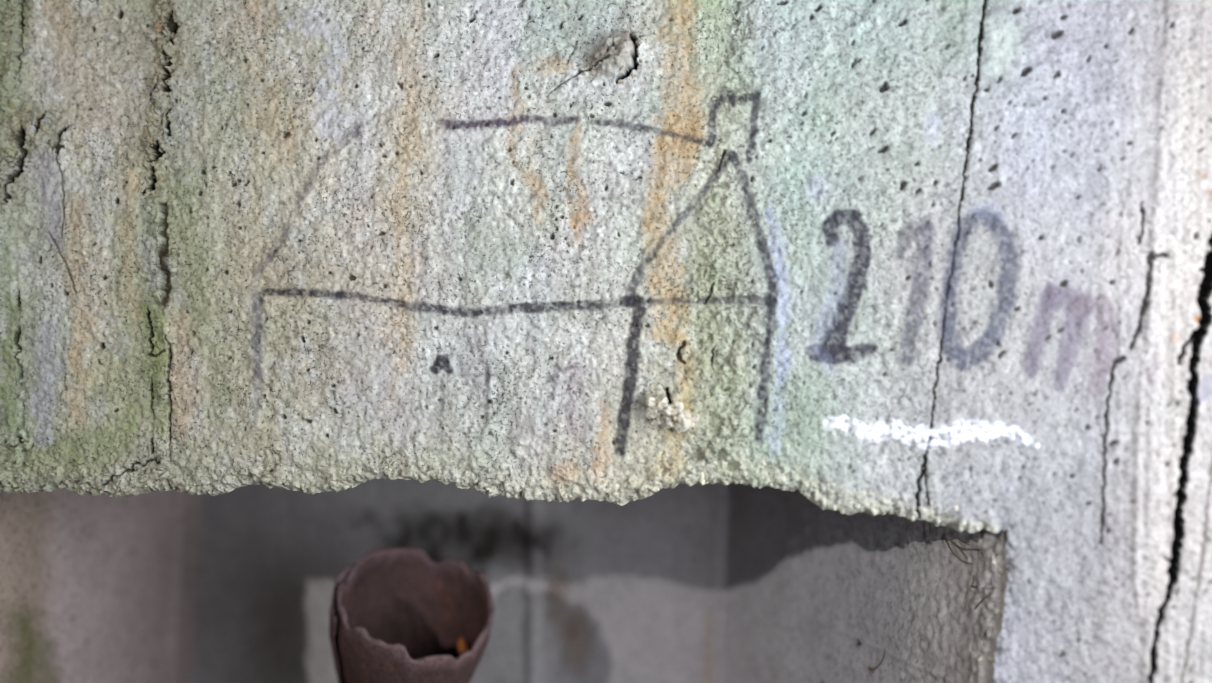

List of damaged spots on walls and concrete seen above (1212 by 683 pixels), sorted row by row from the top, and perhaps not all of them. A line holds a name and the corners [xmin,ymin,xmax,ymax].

crack [10,0,26,93]
crack [1,110,71,204]
crack [99,0,180,493]
spalling [0,195,1008,683]
rust [636,0,708,407]
crack [913,342,943,520]
crack [956,0,989,216]
crack [1098,200,1171,546]
crack [1147,225,1212,683]